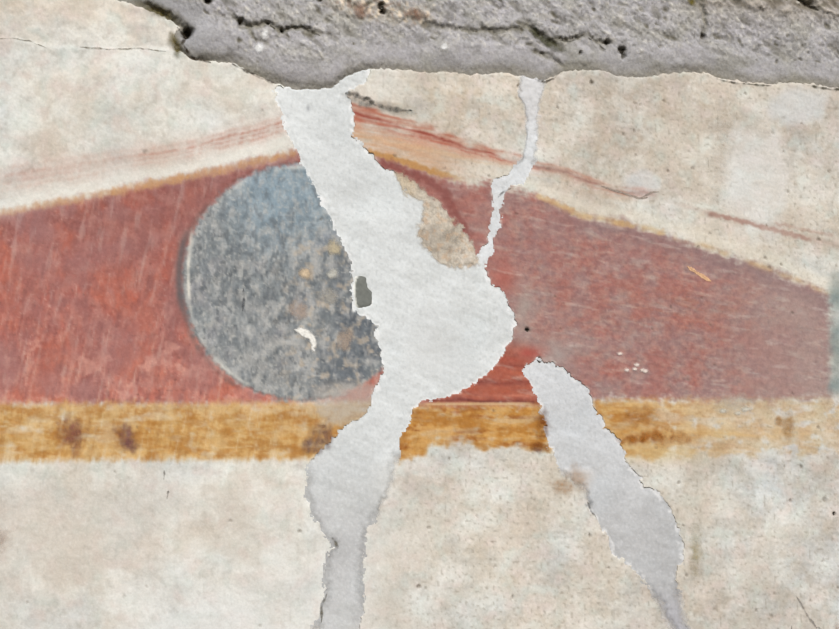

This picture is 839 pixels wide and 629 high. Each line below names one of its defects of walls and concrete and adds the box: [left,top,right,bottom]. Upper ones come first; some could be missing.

flaking render [272,69,517,629]
flaking render [522,357,688,629]